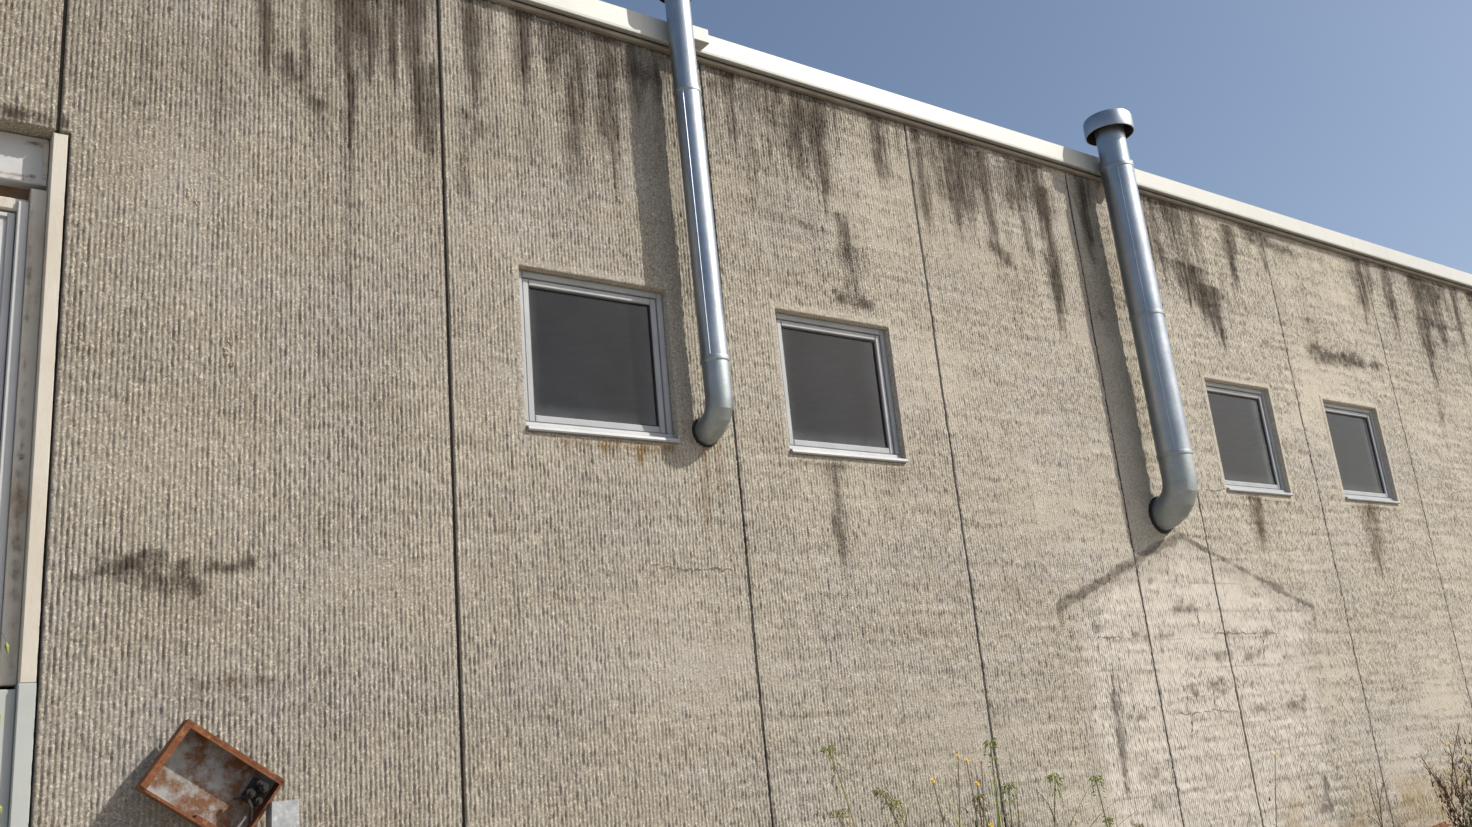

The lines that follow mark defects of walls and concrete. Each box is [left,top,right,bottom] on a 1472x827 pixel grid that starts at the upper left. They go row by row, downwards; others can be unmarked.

leakage [261,0,310,75]
leakage [335,0,435,159]
leakage [462,0,479,99]
leakage [515,9,657,195]
leakage [866,114,888,173]
leakage [758,83,872,308]
leakage [912,128,1066,314]
leakage [1140,196,1225,346]
leakage [1222,224,1275,280]
leakage [1310,344,1378,367]
leakage [1354,258,1398,324]
leakage [1408,276,1472,379]